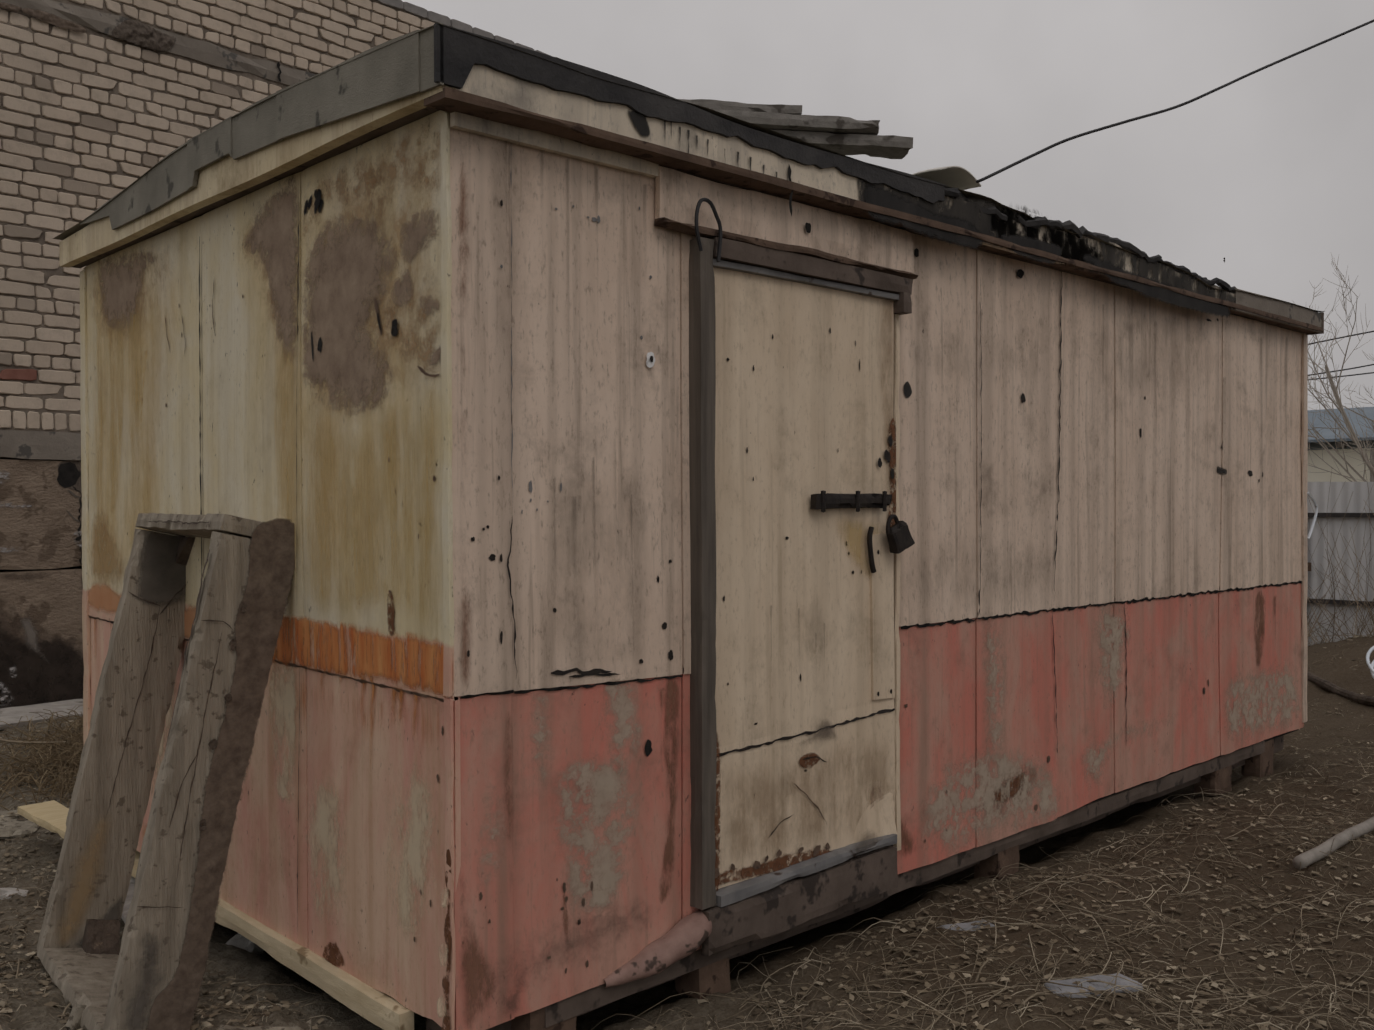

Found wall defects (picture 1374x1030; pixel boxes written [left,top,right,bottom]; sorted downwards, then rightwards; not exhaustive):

leakage [246,177,298,356]
crack [66,487,82,564]
rust [88,522,121,634]
rust [272,593,468,717]
peeling [927,754,1057,846]
peeling [561,881,593,925]